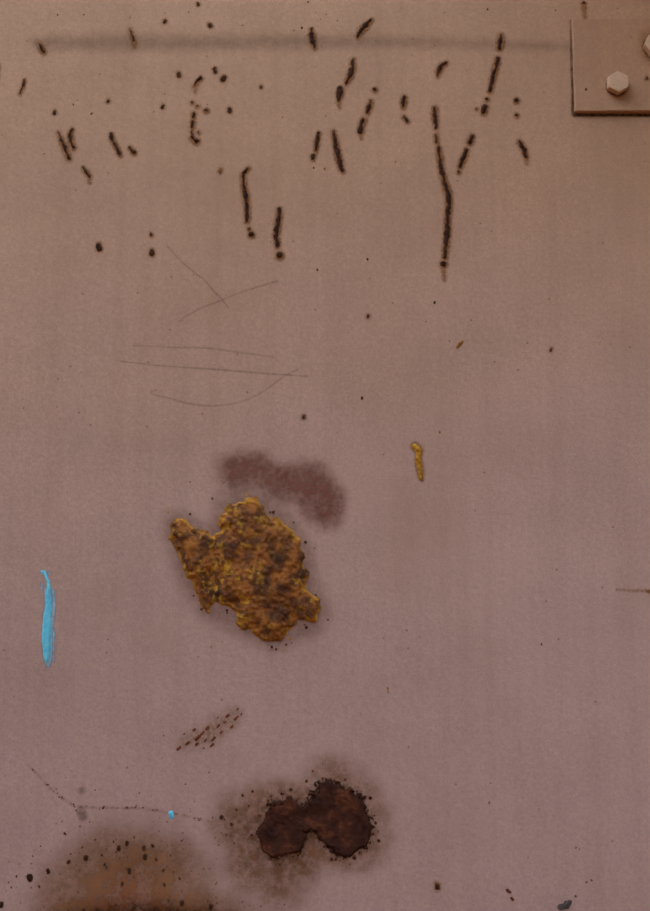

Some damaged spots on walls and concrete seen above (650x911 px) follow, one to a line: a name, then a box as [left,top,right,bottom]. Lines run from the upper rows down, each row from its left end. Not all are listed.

corrosion [475,33,505,116]
corrosion [57,128,76,161]
corrosion [310,129,345,173]
corrosion [457,134,476,175]
corrosion [240,167,255,238]
corrosion [272,207,284,260]
corrosion [431,106,453,281]
corrosion [411,442,423,481]
corrosion [167,455,342,651]
corrosion [212,763,380,897]